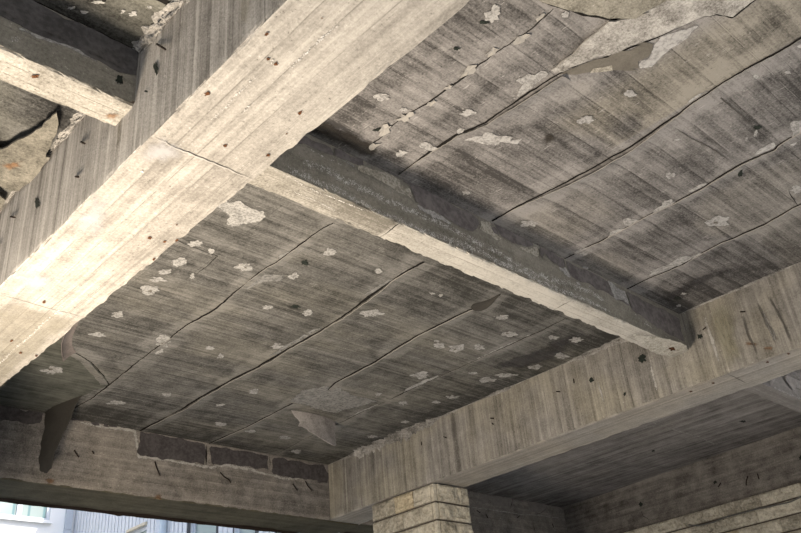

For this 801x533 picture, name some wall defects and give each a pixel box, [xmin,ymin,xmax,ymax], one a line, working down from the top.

crack [71,223,341,410]
peeling [218,201,265,227]
crack [139,262,434,432]
peeling [359,309,385,317]
crack [328,294,570,428]
peeling [298,136,629,306]
crack [363,0,756,180]
spalling [513,26,698,99]
crack [492,37,801,264]
spalling [633,314,687,356]
crack [626,192,801,306]
peeling [137,432,328,483]